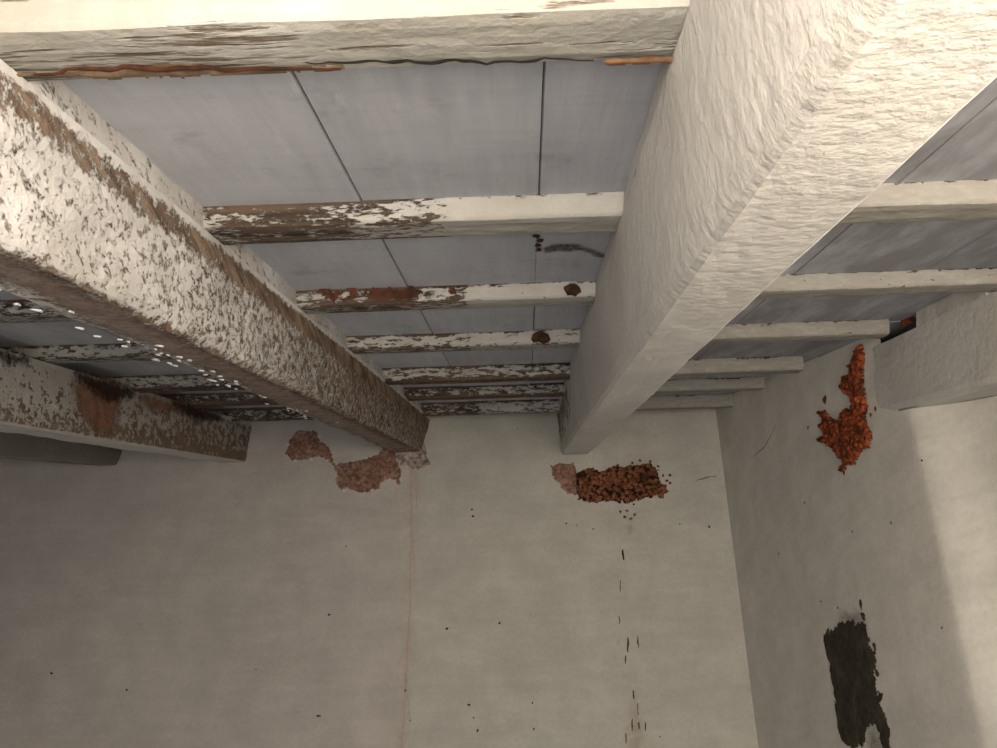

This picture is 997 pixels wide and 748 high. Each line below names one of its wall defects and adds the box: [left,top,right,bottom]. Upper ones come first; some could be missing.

peeling [16,63,345,80]
peeling [316,286,423,306]
peeling [151,345,240,390]
flaking render [807,344,876,475]
peeling [285,408,431,496]
flaking render [550,459,671,520]